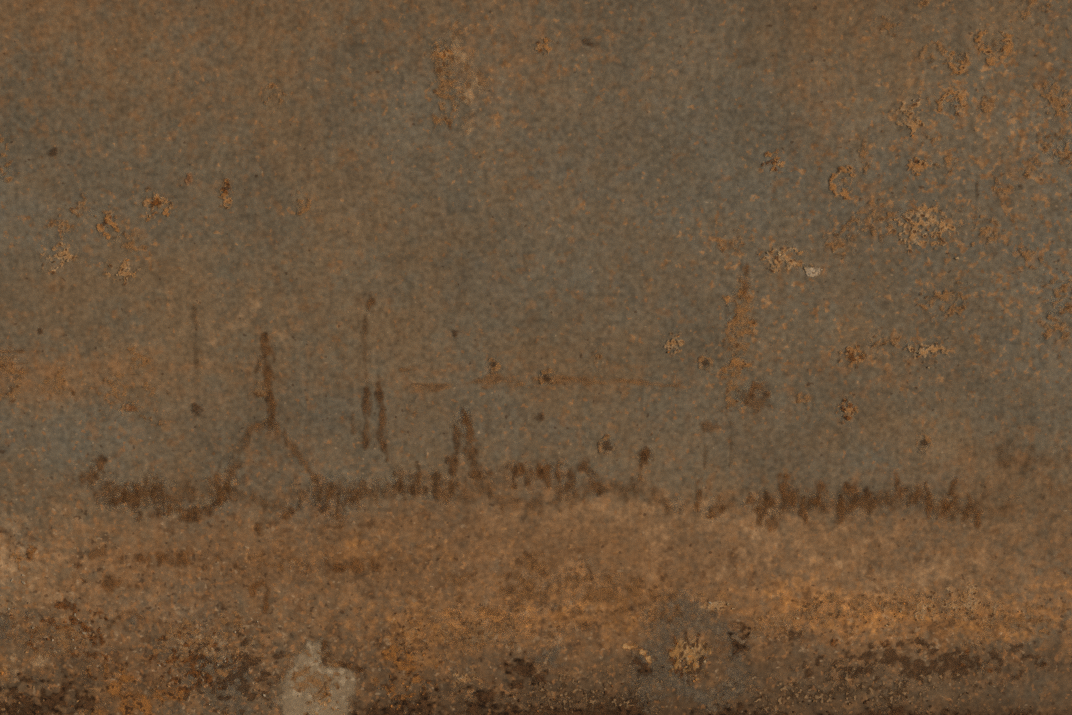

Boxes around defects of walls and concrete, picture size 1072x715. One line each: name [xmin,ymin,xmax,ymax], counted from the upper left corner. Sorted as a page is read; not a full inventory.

corrosion [890,30,1014,137]
corrosion [95,211,146,285]
corrosion [826,140,959,259]
corrosion [721,280,759,409]
corrosion [839,336,951,368]
damp [363,383,386,451]
corrosion [0,598,285,715]